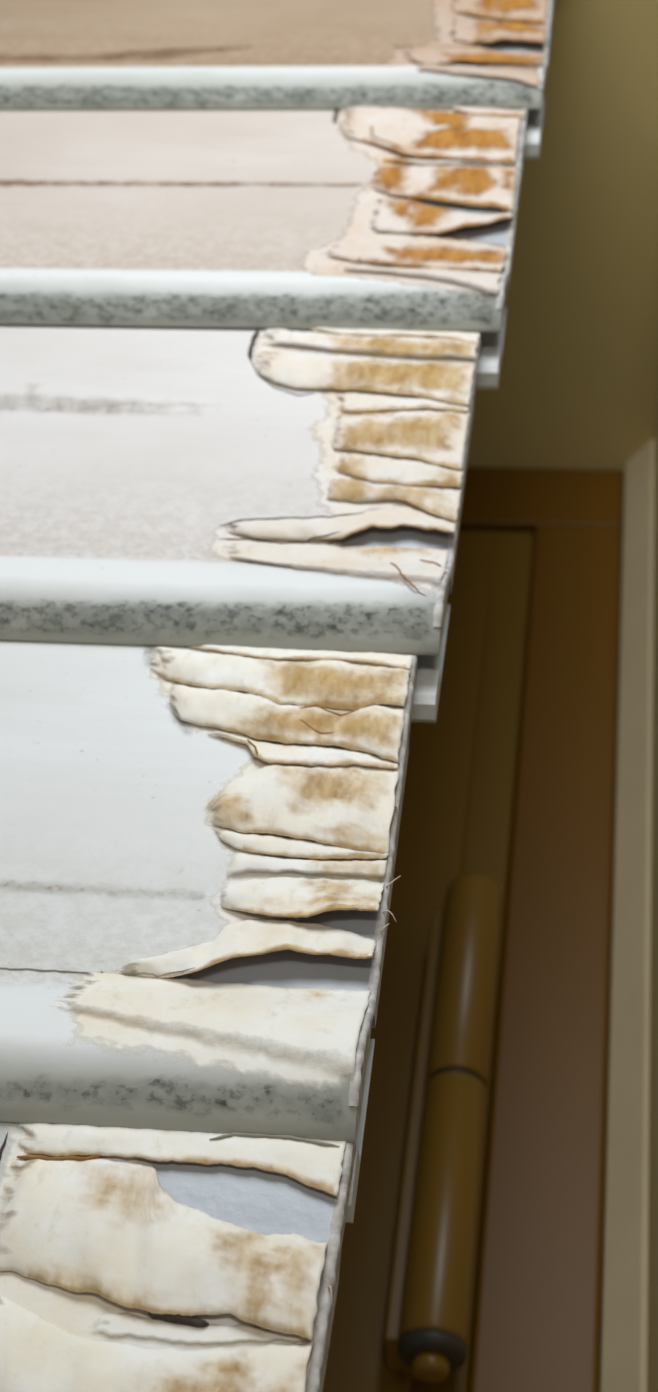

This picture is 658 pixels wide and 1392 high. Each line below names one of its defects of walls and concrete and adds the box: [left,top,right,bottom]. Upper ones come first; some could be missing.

peeling [387,0,553,91]
peeling [298,106,527,309]
peeling [209,327,480,627]
peeling [63,645,417,1109]
peeling [0,1123,353,1392]